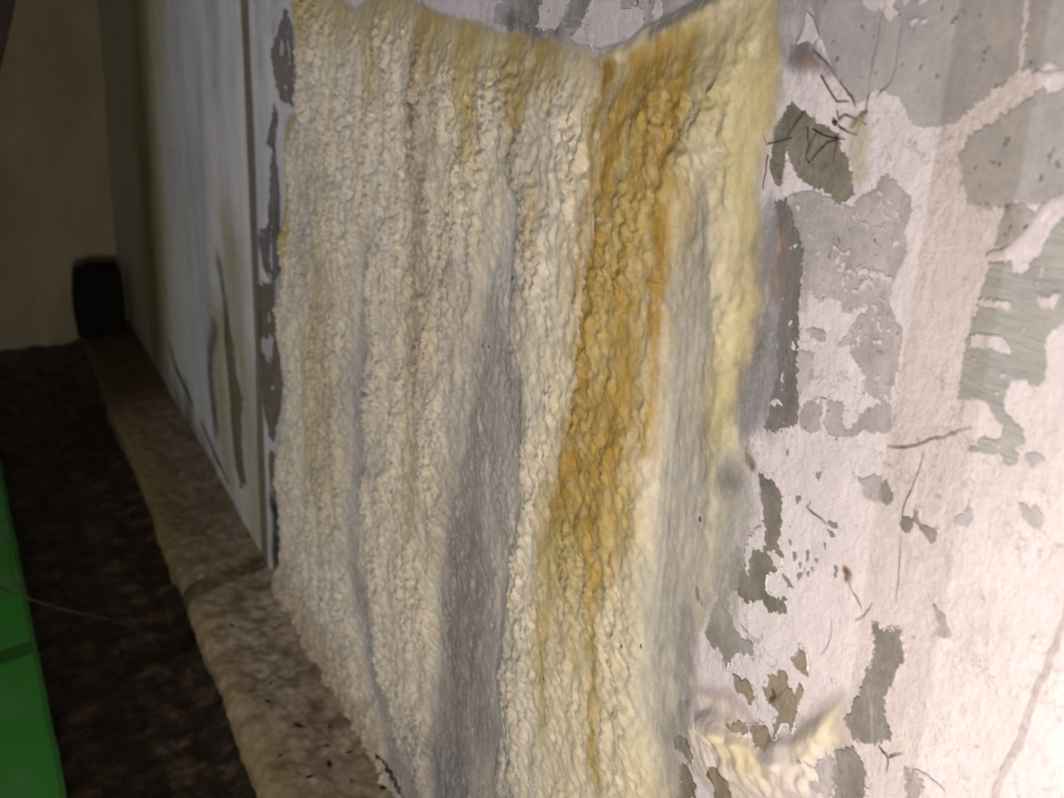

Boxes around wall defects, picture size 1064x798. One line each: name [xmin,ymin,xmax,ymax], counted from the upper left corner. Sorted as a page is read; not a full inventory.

flaking render [258,8,296,496]
damp [208,0,826,798]
peeling [479,0,698,53]
corrosion [535,27,696,778]
peeling [764,102,912,448]
peeling [797,0,1064,129]
peeling [957,218,1064,469]
peeling [958,87,1064,249]
peeling [706,767,731,798]
peeling [704,469,818,753]
peeling [797,621,908,798]
crack [991,611,1064,798]